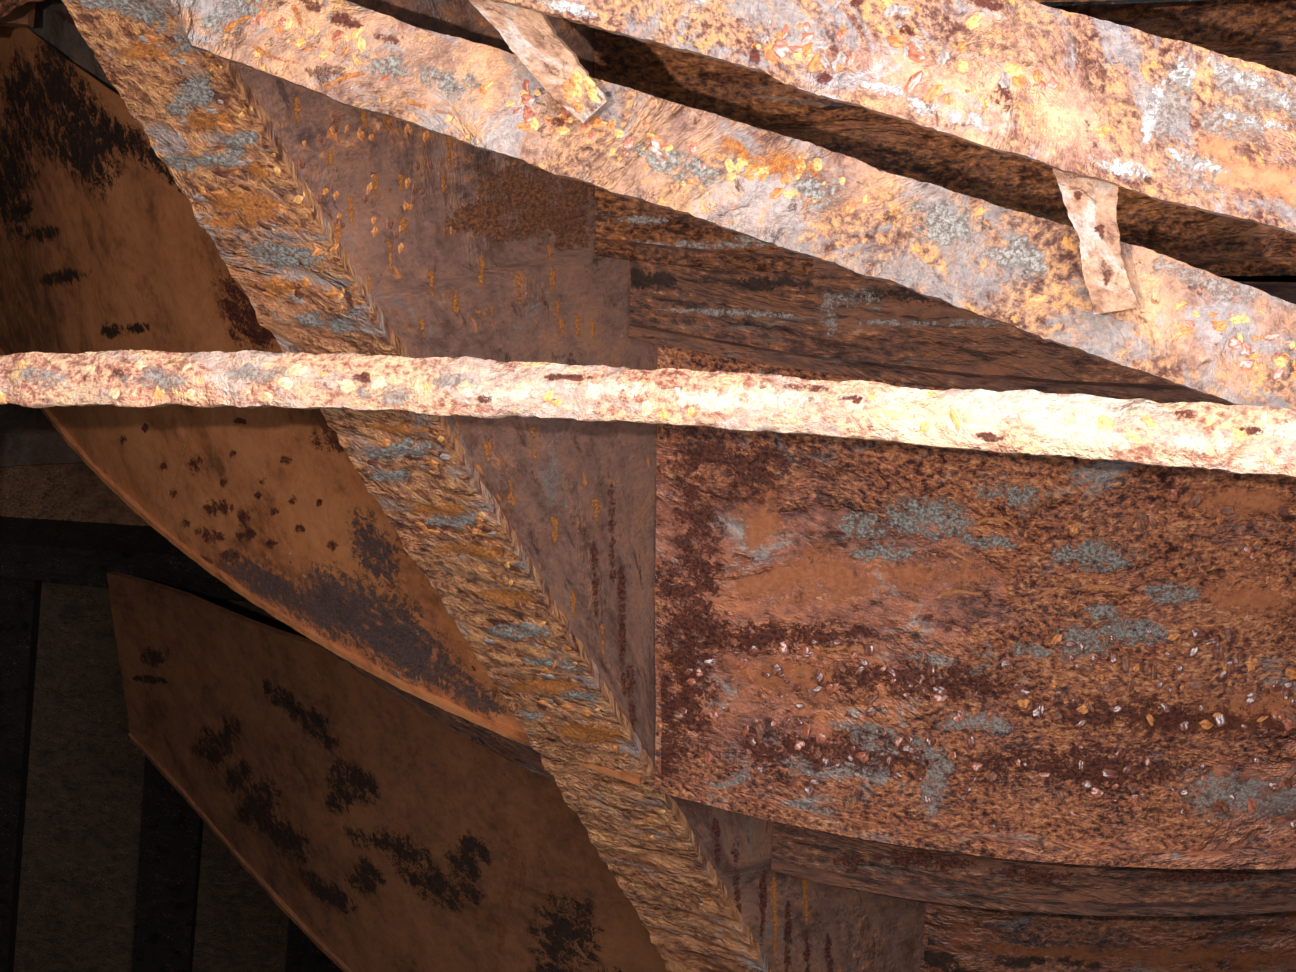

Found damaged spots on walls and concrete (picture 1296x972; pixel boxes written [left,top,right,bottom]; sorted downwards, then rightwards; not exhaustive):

rust [223,4,408,88]
rust [751,19,873,73]
rust [879,0,983,105]
rust [479,70,845,199]
rust [202,110,596,338]
water stain [213,273,275,351]
rust [246,364,391,404]
water stain [310,426,344,453]
water stain [219,508,507,718]
rust [557,484,636,771]
water stain [191,680,495,914]
rust [759,871,841,972]